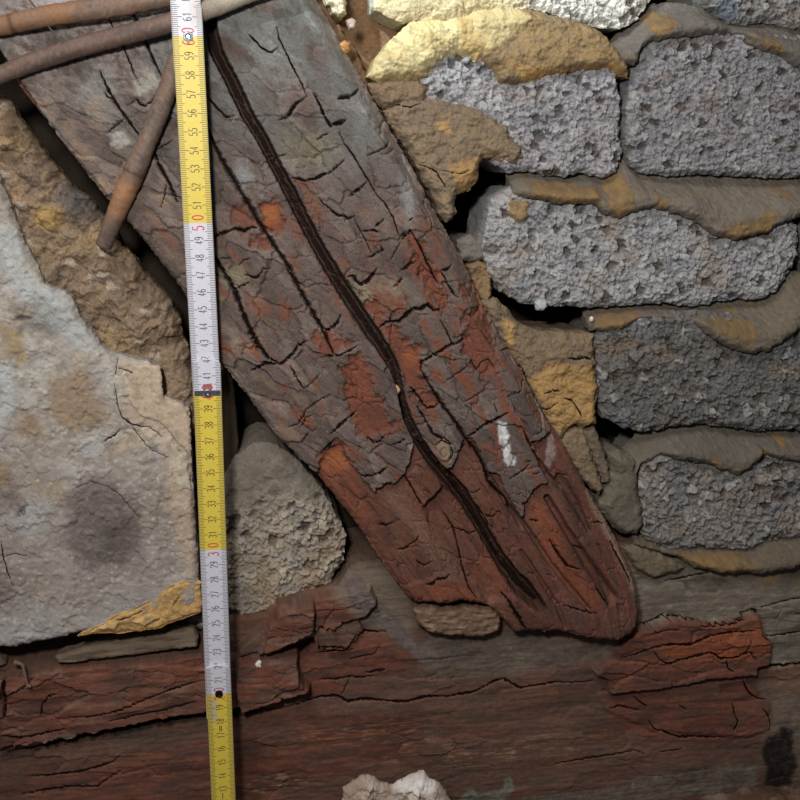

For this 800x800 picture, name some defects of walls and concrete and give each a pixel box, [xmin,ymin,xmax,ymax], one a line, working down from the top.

crack [102,359,167,457]
crack [1,543,27,587]
crack [264,611,590,709]